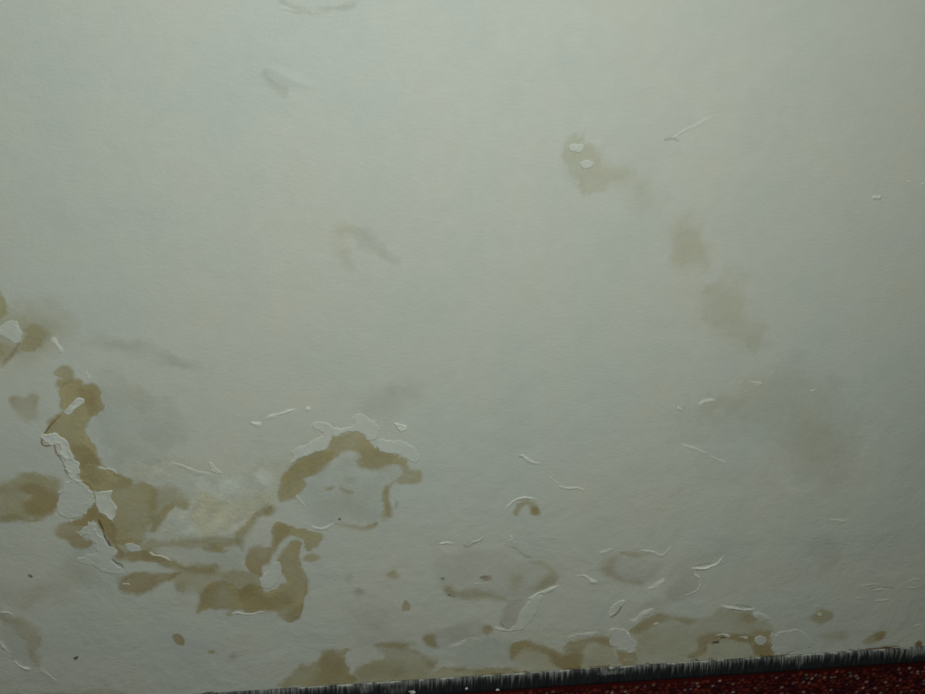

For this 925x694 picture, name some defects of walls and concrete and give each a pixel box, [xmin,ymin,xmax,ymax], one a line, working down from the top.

water stain [0,297,30,344]
peeling [290,413,420,464]
water stain [0,367,189,593]
peeling [493,584,563,632]